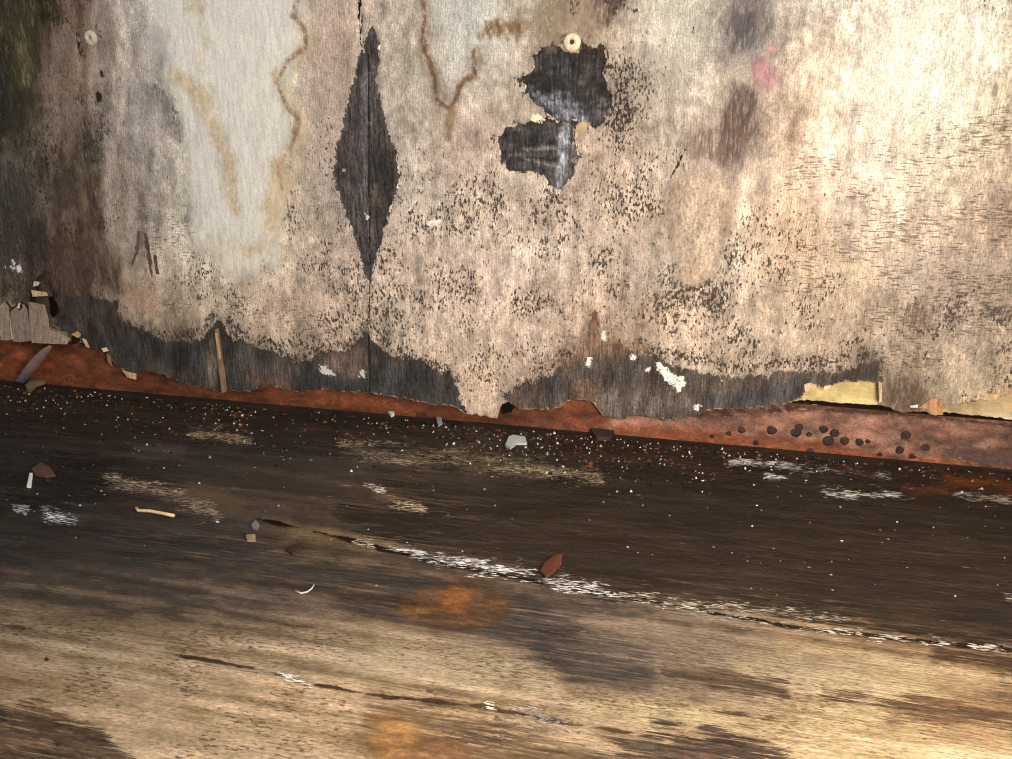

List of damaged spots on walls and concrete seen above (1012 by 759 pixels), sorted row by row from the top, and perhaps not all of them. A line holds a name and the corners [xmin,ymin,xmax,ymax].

leakage [144,0,318,277]
peeling [333,22,401,319]
peeling [488,34,638,201]
peeling [82,338,136,380]
corrosion [279,392,416,416]
leakage [0,118,1012,698]
corrosion [608,423,882,458]
corrosion [697,405,1012,427]
peeling [910,398,943,415]
corrosion [895,431,1012,495]
leakage [361,691,794,759]
leakage [819,684,1012,731]